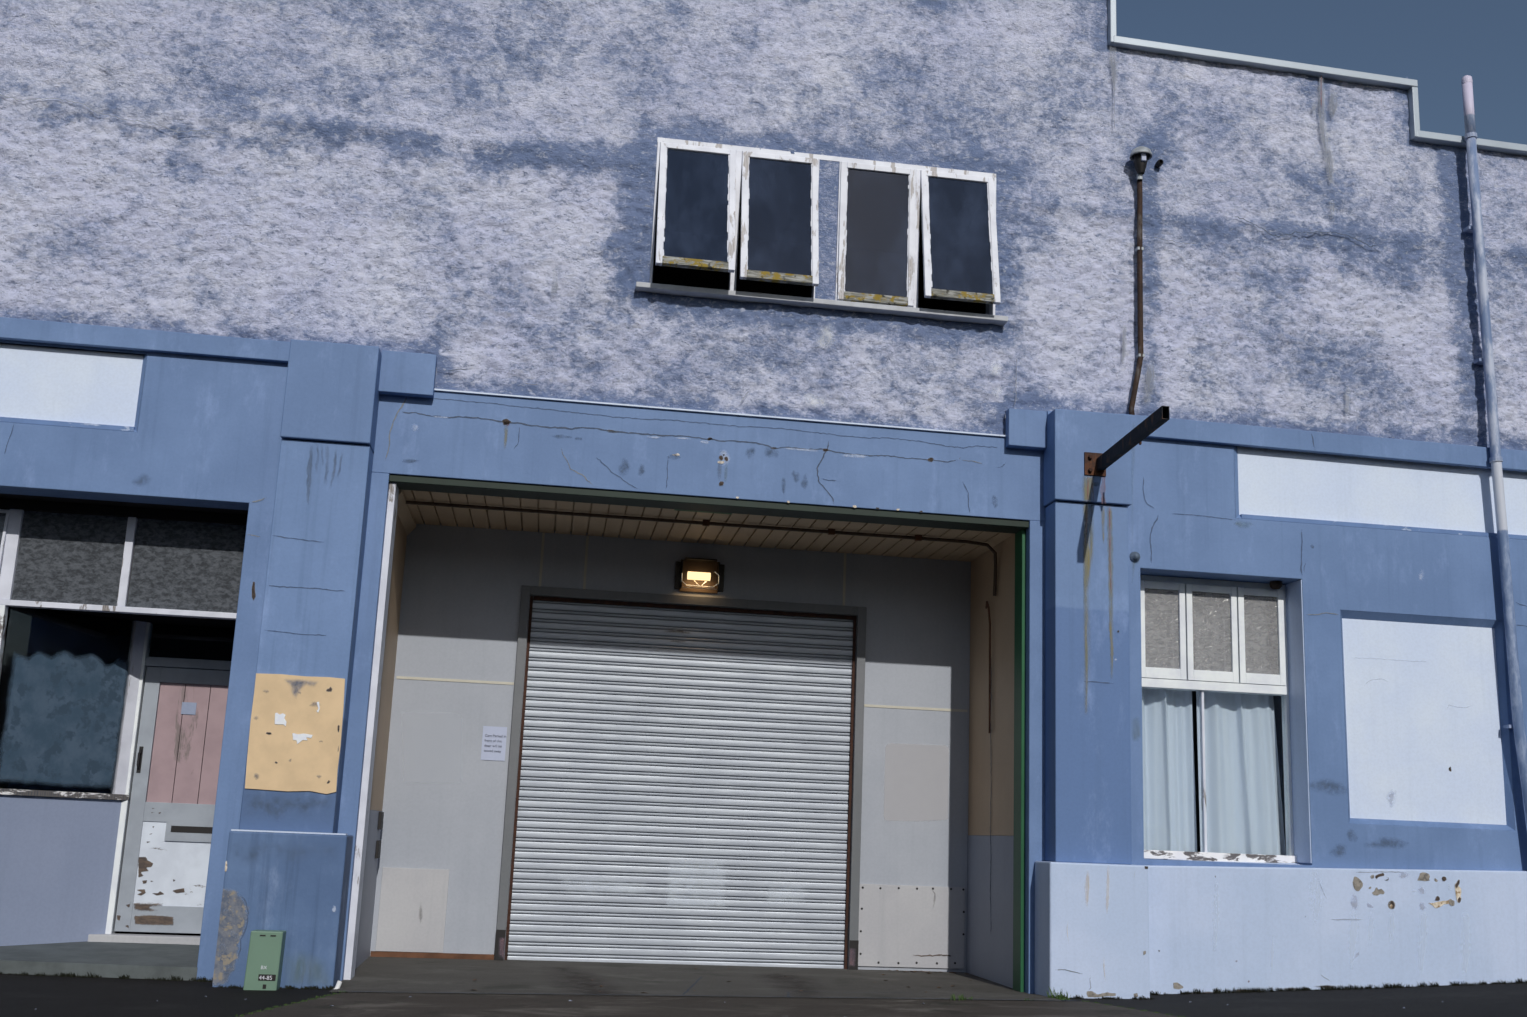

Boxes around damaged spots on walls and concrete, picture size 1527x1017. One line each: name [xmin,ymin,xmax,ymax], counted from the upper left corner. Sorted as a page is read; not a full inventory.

crack [386,369,1005,512]
rust [1084,477,1113,704]
peeling [117,808,185,928]
spalling [213,861,249,985]
spalling [1353,873,1395,909]
spalling [1418,872,1461,908]